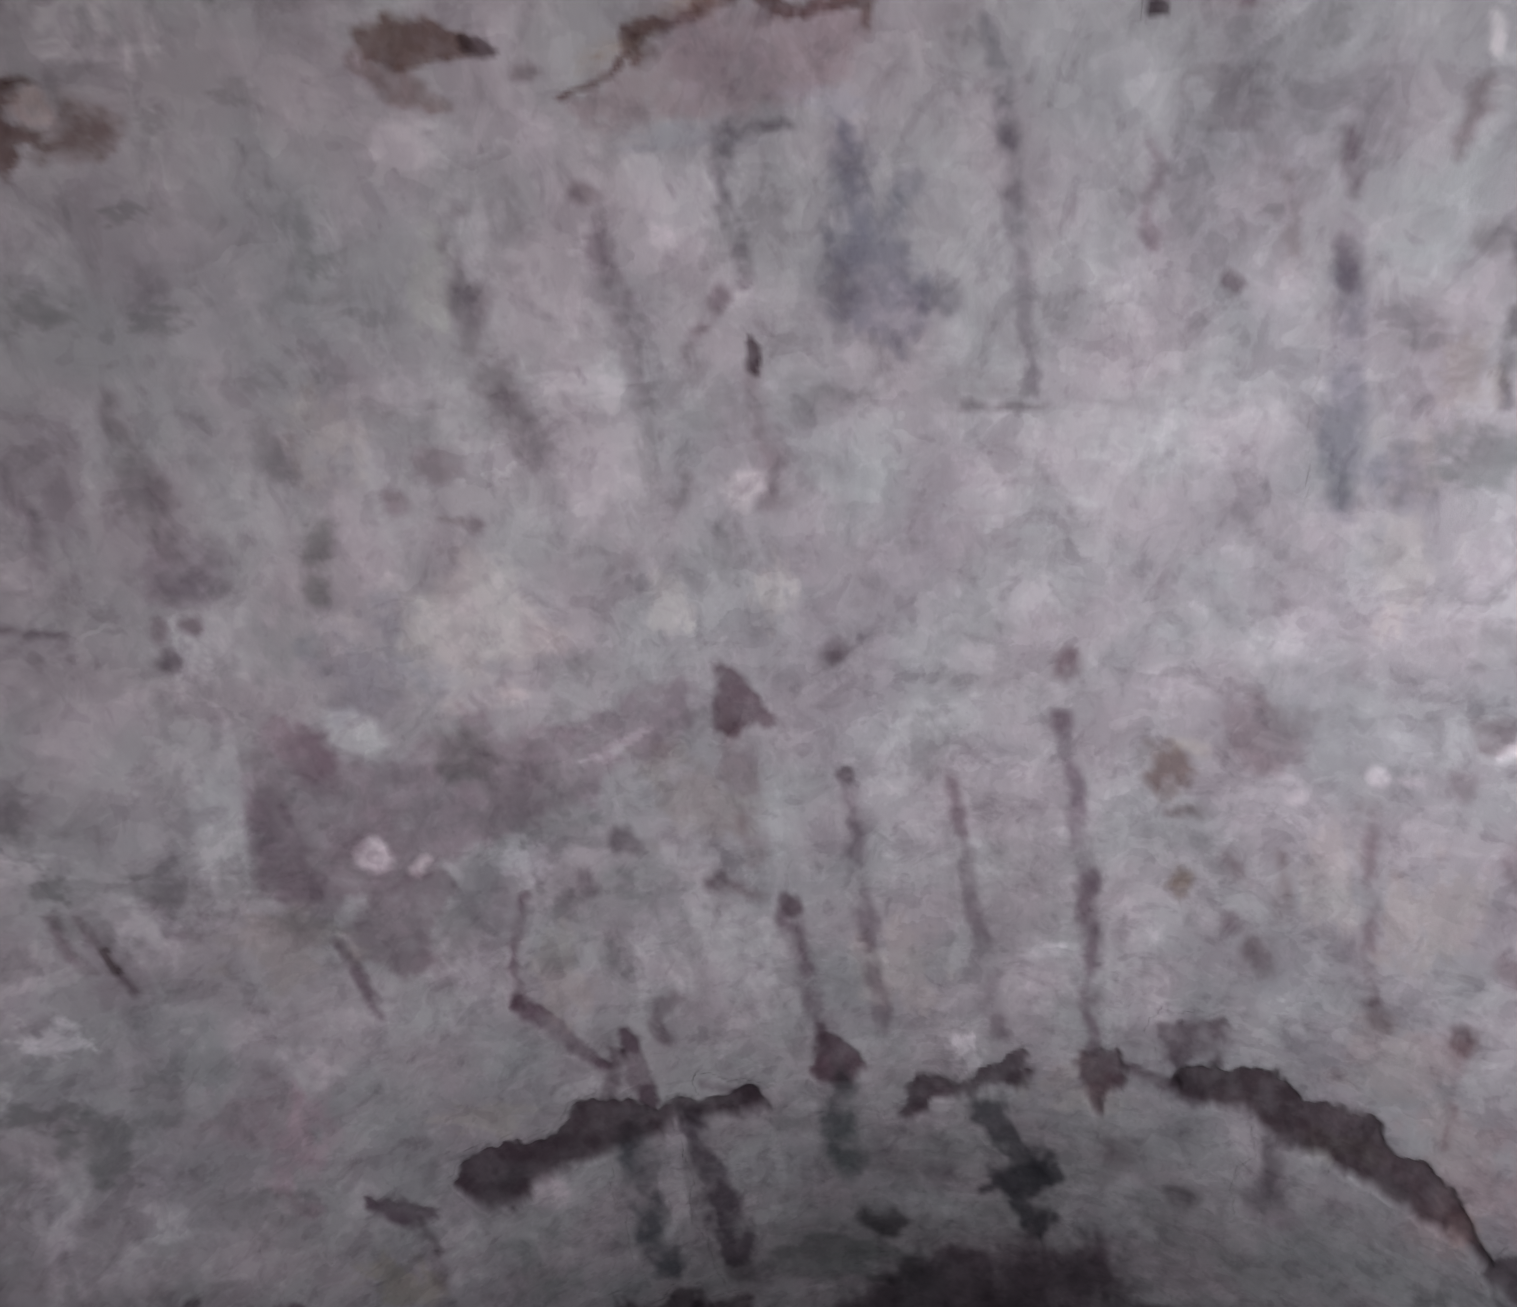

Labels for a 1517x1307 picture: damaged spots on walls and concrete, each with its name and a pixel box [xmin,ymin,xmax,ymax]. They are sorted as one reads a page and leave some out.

peeling [550,0,885,152]
water stain [809,627,855,675]
water stain [1131,663,1335,990]
water stain [227,637,1196,1307]
water stain [1346,788,1405,1041]
water stain [1433,1017,1490,1159]
water stain [1159,1179,1208,1224]
water stain [1230,1116,1316,1242]